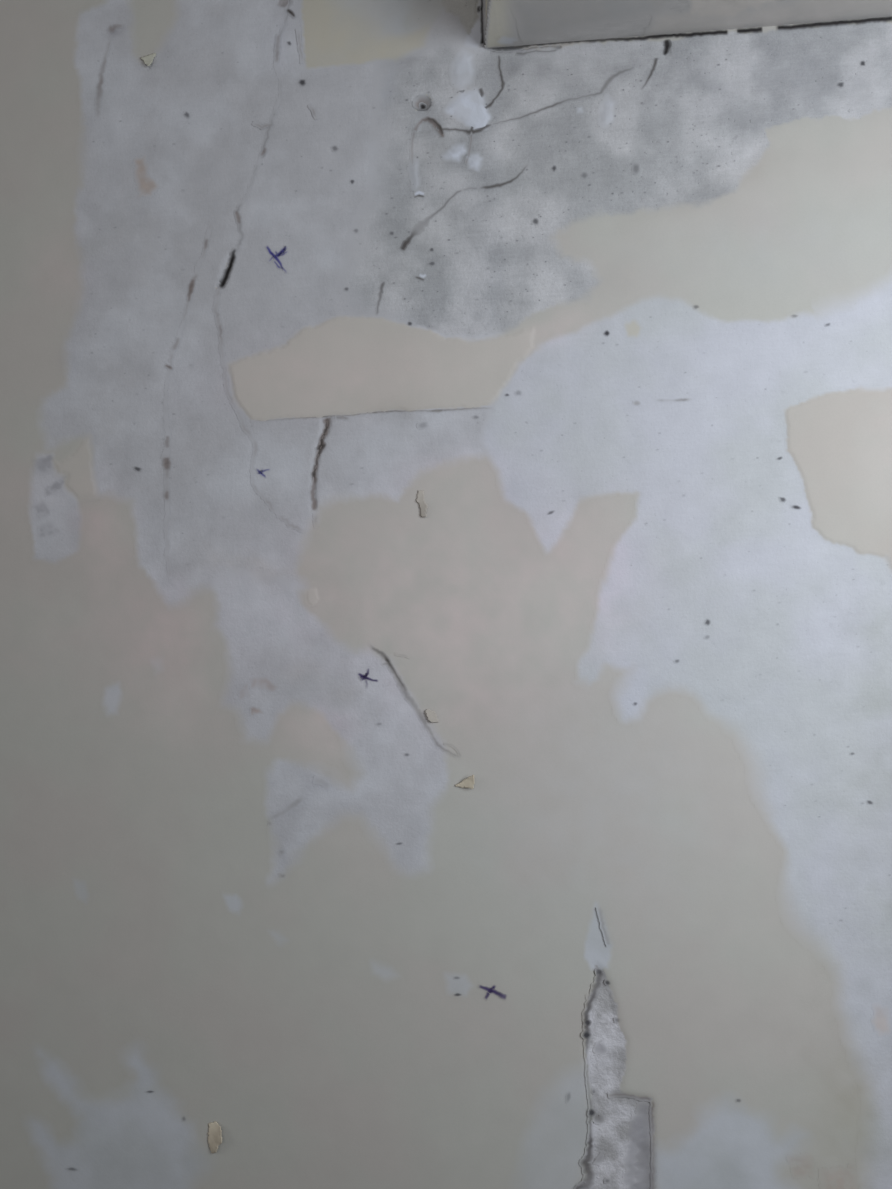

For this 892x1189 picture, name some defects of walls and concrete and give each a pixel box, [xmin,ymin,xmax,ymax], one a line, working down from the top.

crack [161,0,494,580]
crack [368,642,462,759]
peeling [34,0,892,890]
crack [398,0,892,252]
peeling [479,264,892,1189]